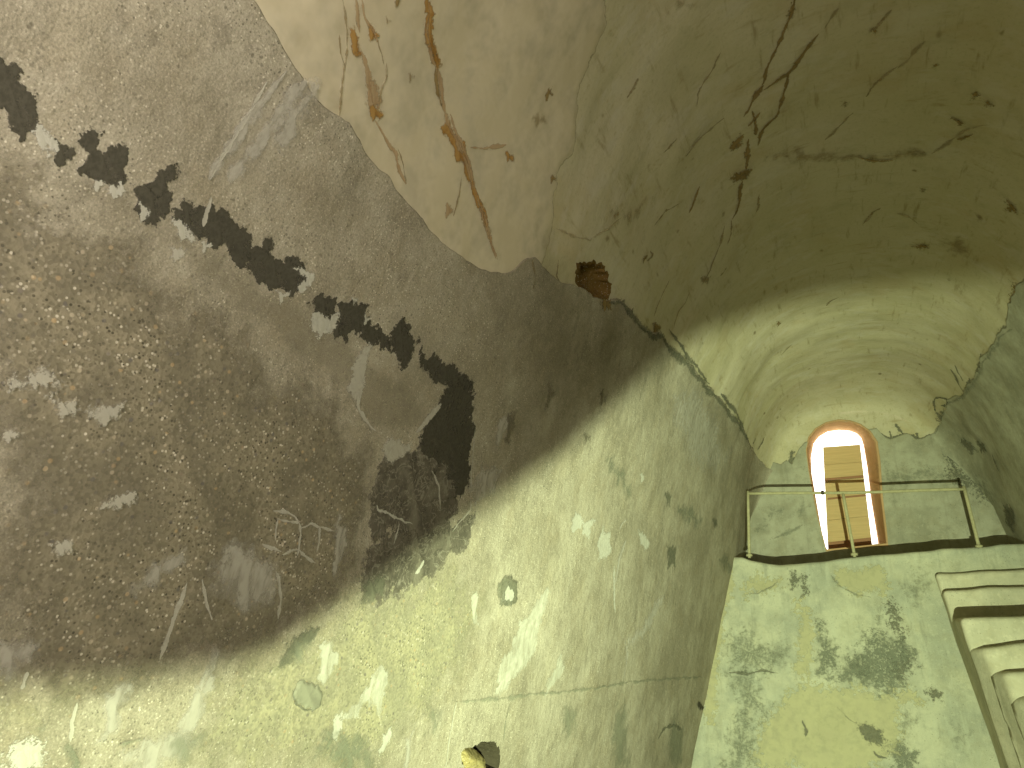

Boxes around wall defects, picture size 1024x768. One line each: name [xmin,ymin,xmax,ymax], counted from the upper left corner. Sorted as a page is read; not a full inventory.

corrosion [350,0,406,184]
flaking render [254,0,607,273]
corrosion [424,0,514,258]
crack [654,0,819,325]
spalling [575,259,612,300]
flaking render [0,179,367,706]
flaking render [497,575,517,607]
mould [789,570,810,597]
mould [815,596,921,698]
hole [461,741,500,768]